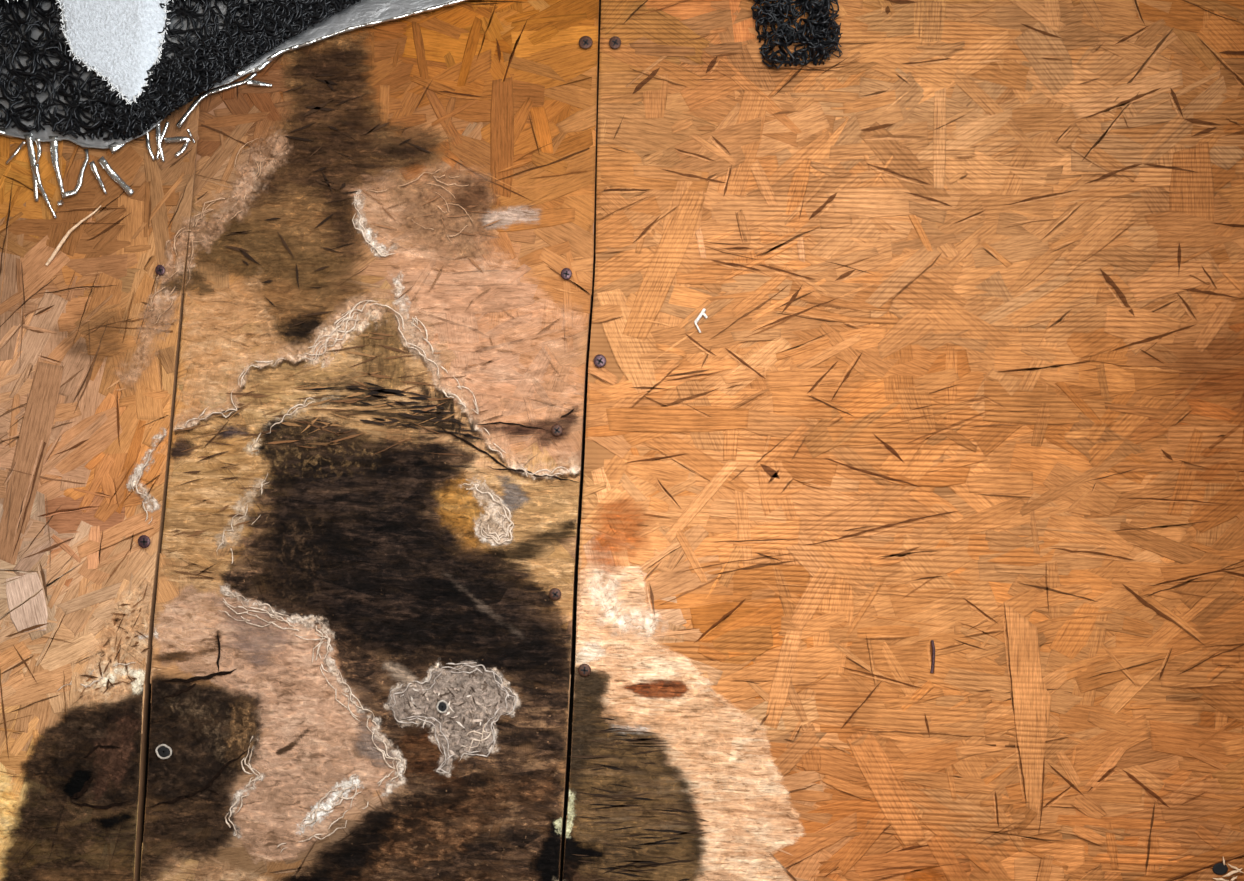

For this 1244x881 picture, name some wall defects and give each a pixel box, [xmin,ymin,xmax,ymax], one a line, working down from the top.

water stain [0,35,803,881]